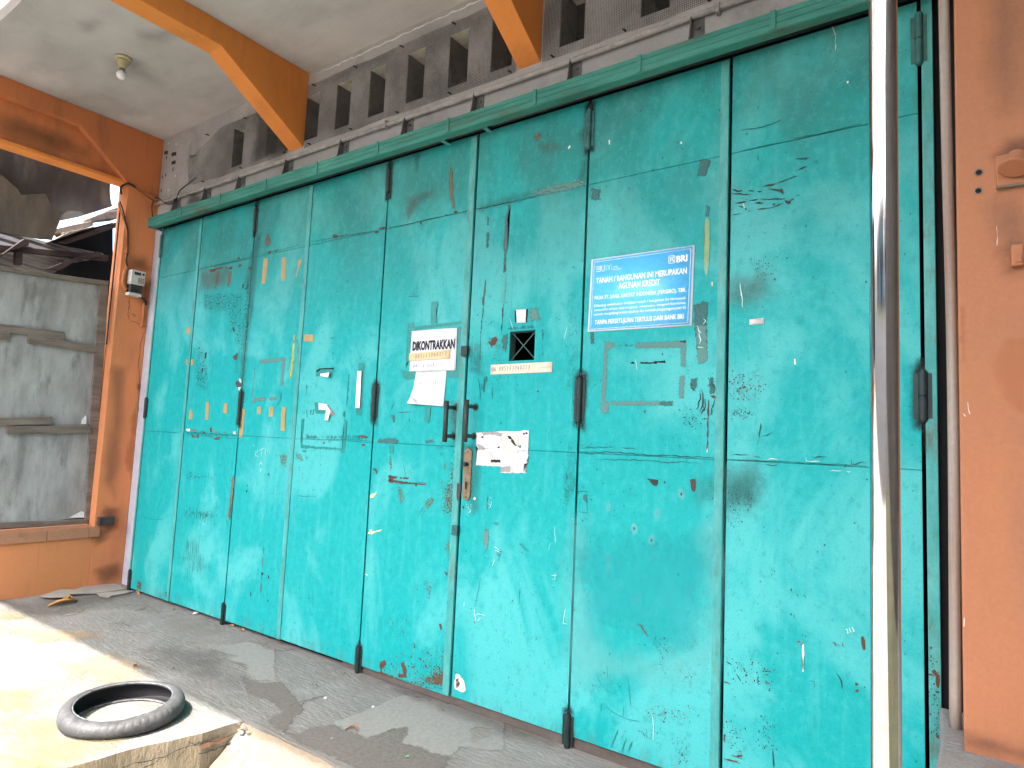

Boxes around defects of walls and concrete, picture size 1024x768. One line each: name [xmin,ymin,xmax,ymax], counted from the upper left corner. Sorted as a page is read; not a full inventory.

corrosion [388,465,426,493]
corrosion [441,458,461,516]
corrosion [374,618,444,691]
peeling [211,641,505,768]
crack [123,732,237,768]